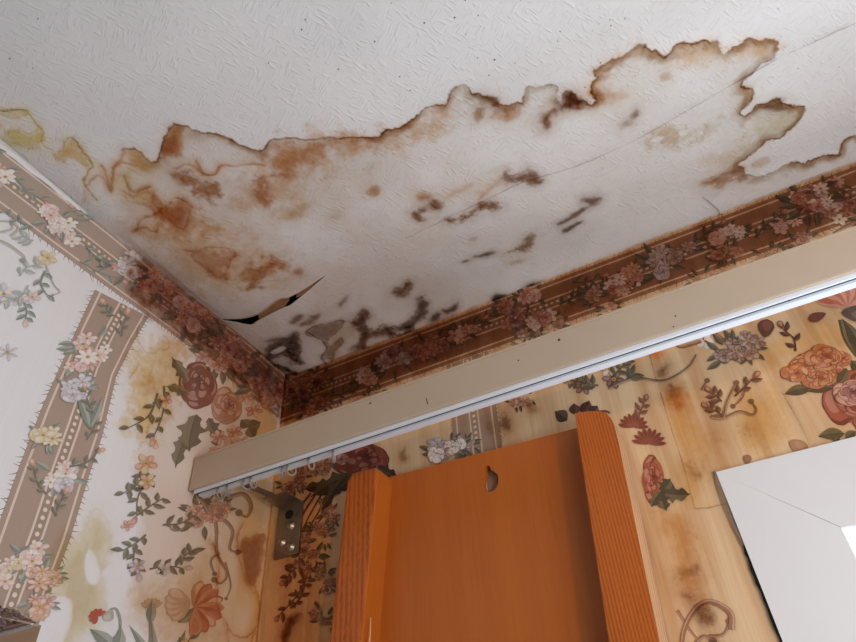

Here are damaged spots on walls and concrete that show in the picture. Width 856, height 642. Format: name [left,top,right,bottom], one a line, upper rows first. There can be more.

damp [545,65,603,121]
damp [739,79,805,121]
damp [505,173,542,184]
damp [558,198,600,232]
mould [266,315,317,376]
mould [339,297,457,349]